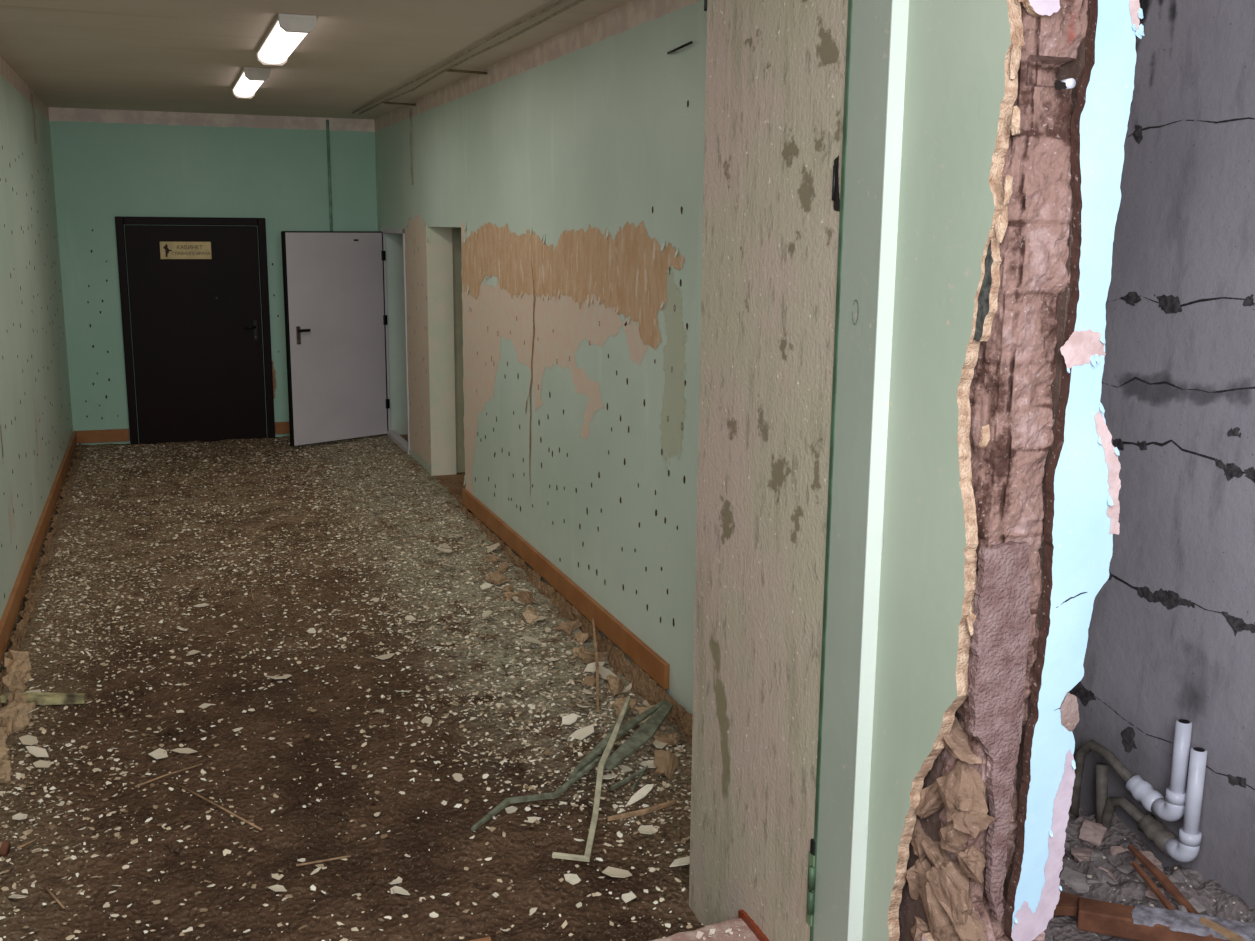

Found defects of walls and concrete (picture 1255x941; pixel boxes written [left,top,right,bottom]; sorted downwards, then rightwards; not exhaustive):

crack [1128,117,1255,144]
crack [1106,291,1255,314]
peeling [461,206,685,512]
crack [1105,377,1255,393]
crack [1112,427,1255,483]
peeling [966,612,976,636]
crack [1056,572,1255,636]
spalling [1054,692,1079,731]
spalling [906,716,996,941]
peeling [1011,749,1076,941]